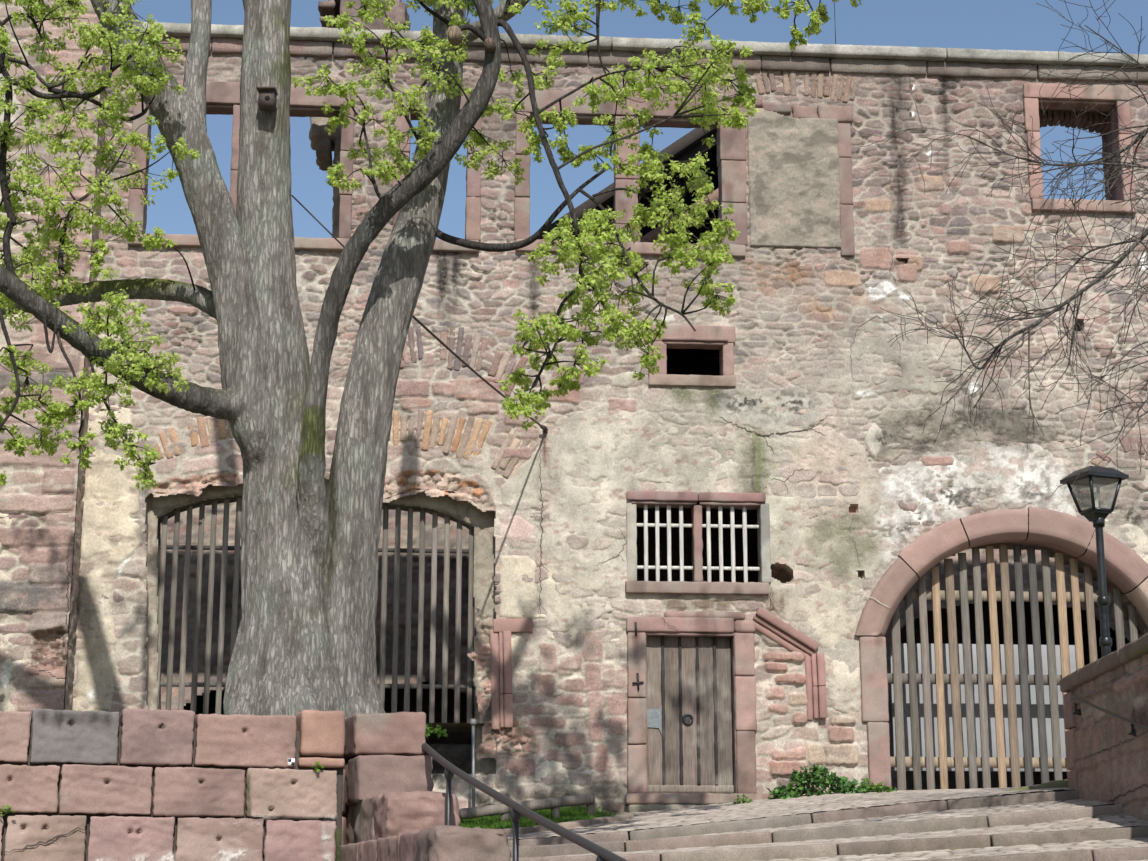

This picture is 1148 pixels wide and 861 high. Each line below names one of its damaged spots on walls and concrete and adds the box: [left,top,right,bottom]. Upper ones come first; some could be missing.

damp [892,79,915,238]
peeling [0,314,23,365]
crack [720,415,828,490]
peeling [0,512,26,528]
peeling [12,365,240,711]
peeling [383,318,1062,760]
peeling [0,570,26,584]